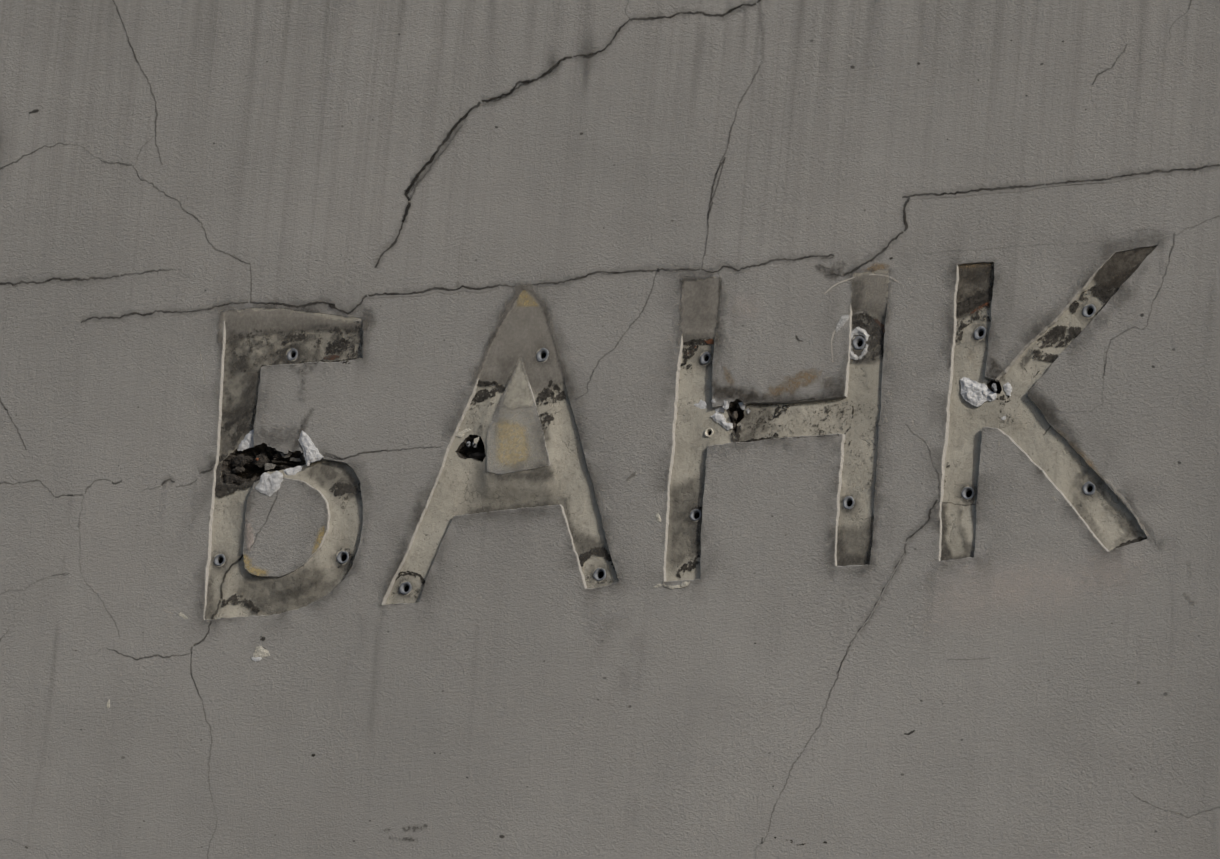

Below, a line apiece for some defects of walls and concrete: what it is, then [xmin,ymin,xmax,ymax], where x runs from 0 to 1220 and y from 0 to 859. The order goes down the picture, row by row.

crack [87,0,1215,320]
crack [0,277,80,285]
spalling [220,430,324,496]
crack [191,555,243,692]
crack [858,500,960,633]